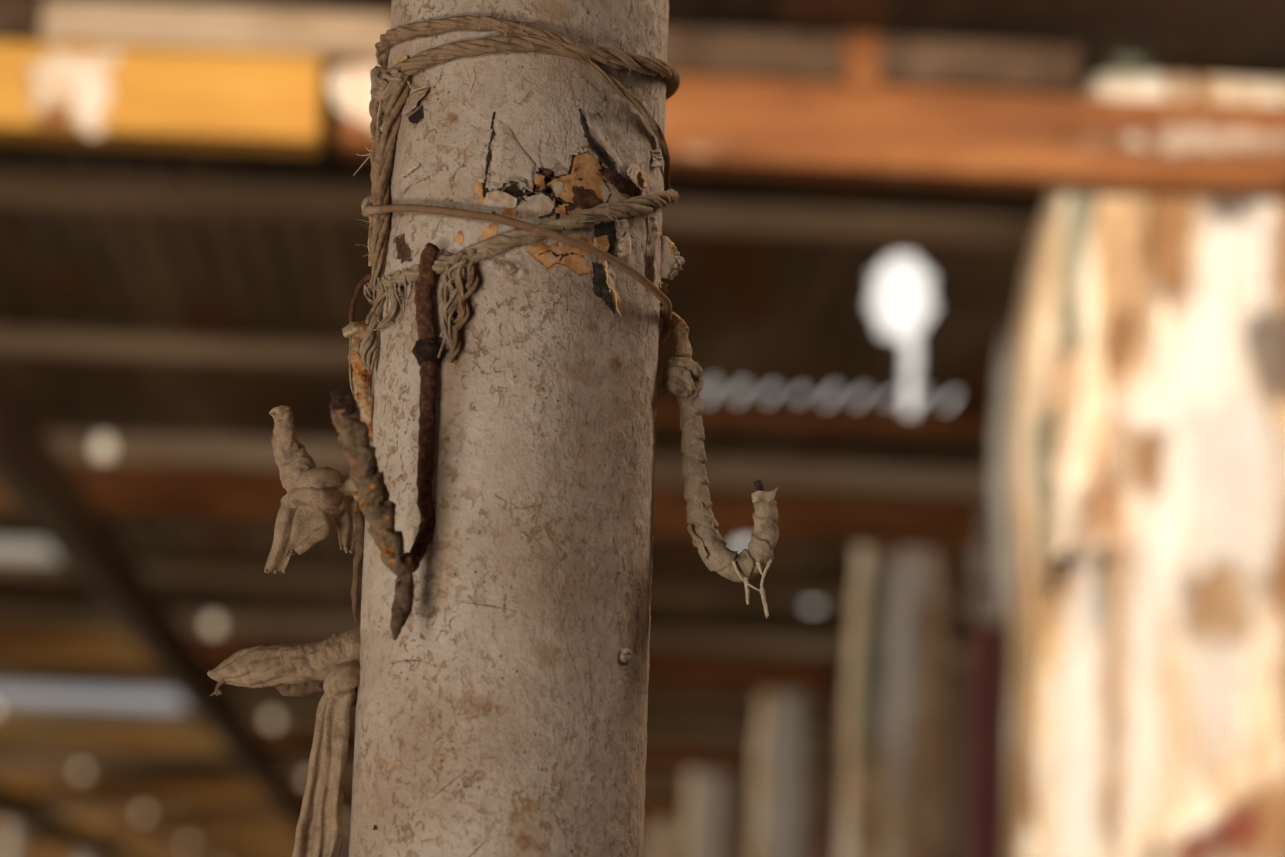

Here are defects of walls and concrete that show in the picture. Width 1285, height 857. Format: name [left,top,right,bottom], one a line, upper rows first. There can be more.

crack [460,112,547,198]
peeling [472,109,662,240]
peeling [524,216,686,321]